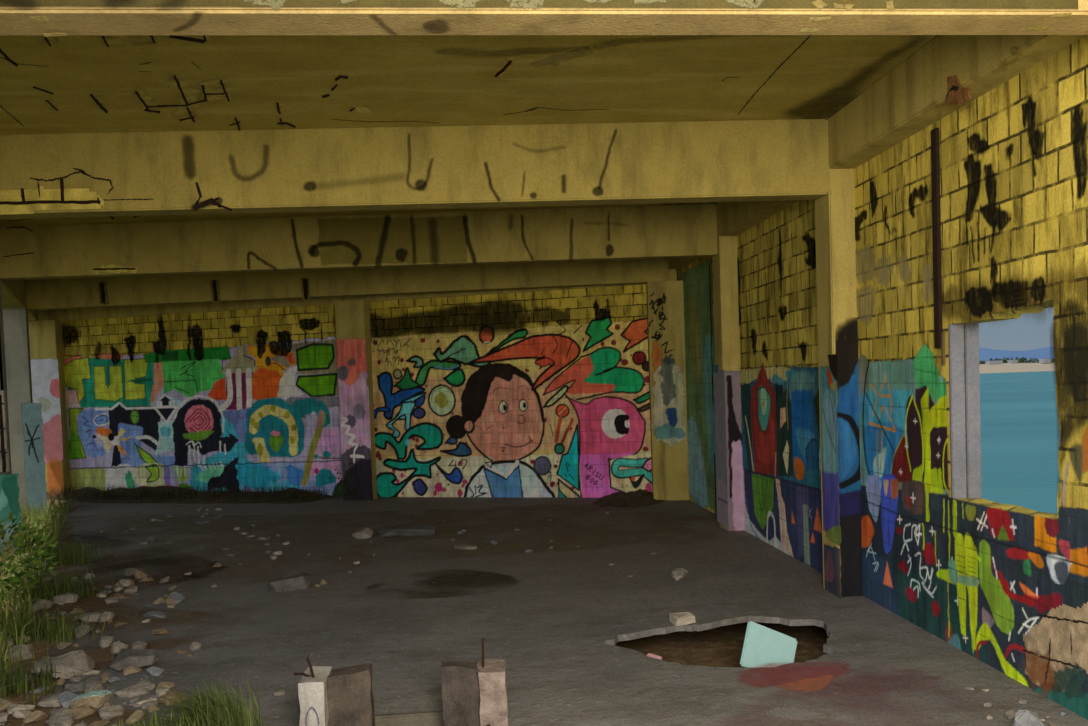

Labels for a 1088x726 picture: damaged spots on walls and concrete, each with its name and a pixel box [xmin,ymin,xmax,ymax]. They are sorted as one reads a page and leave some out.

peeling [1023,602,1088,698]